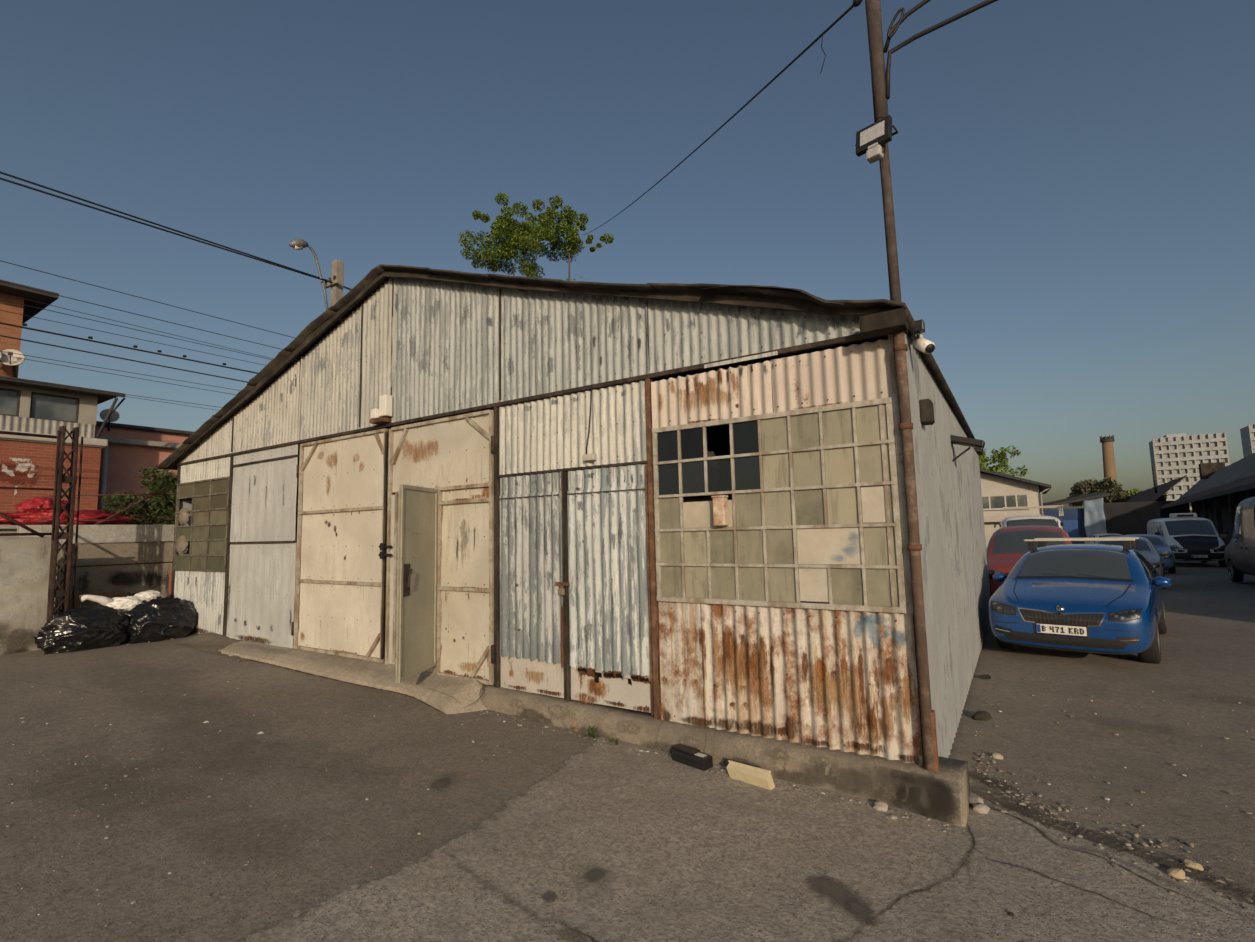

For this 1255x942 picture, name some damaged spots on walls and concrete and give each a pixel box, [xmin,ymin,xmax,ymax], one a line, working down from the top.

corrosion [659,370,739,423]
peeling [2,458,35,495]
corrosion [508,671,561,696]
corrosion [579,601,923,766]